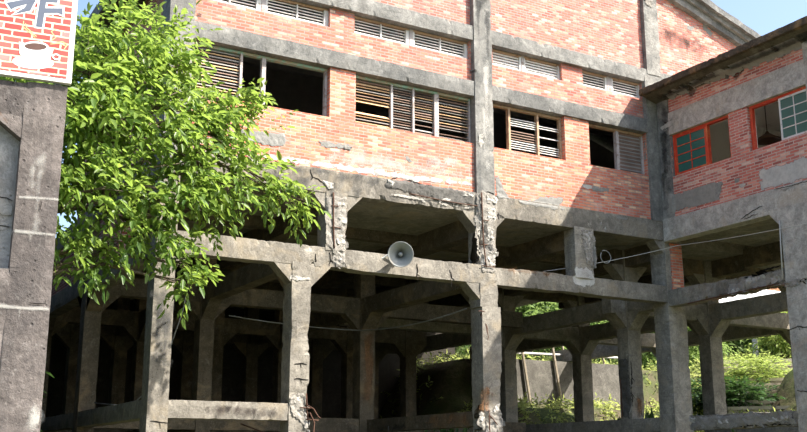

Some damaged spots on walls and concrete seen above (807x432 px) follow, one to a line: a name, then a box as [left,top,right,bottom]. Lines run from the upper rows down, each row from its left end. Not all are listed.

spalling [251,154,499,273]
spalling [573,229,597,288]
spalling [285,393,319,432]
spalling [474,403,505,432]